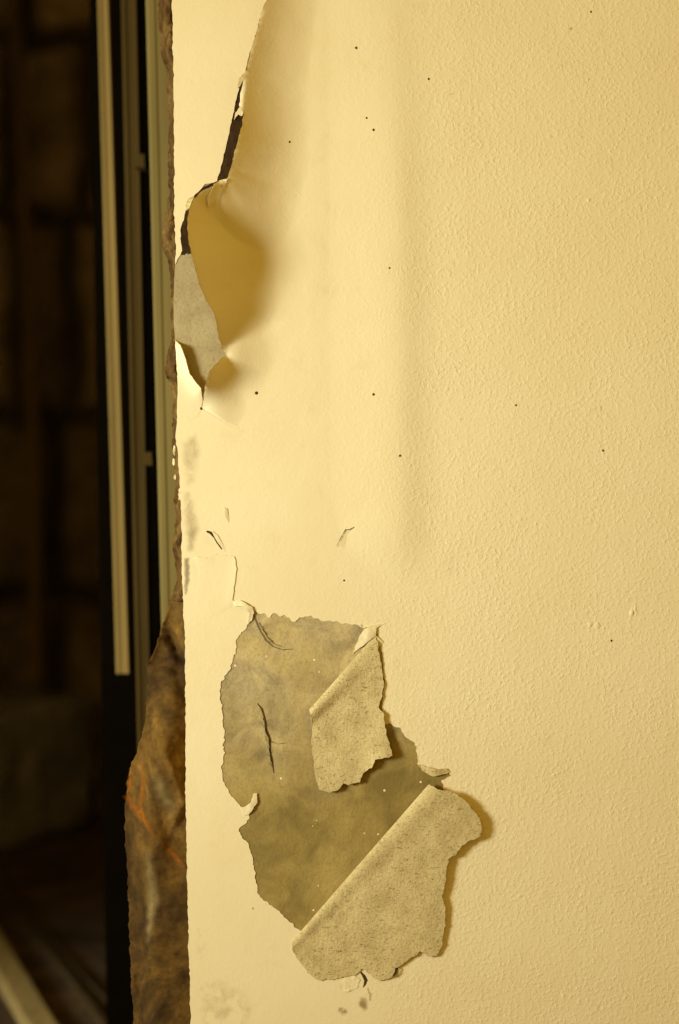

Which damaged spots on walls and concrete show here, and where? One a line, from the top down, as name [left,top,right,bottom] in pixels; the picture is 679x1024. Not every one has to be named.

peeling [124,0,329,1024]
crack [257,703,287,773]
peeling [220,600,482,981]